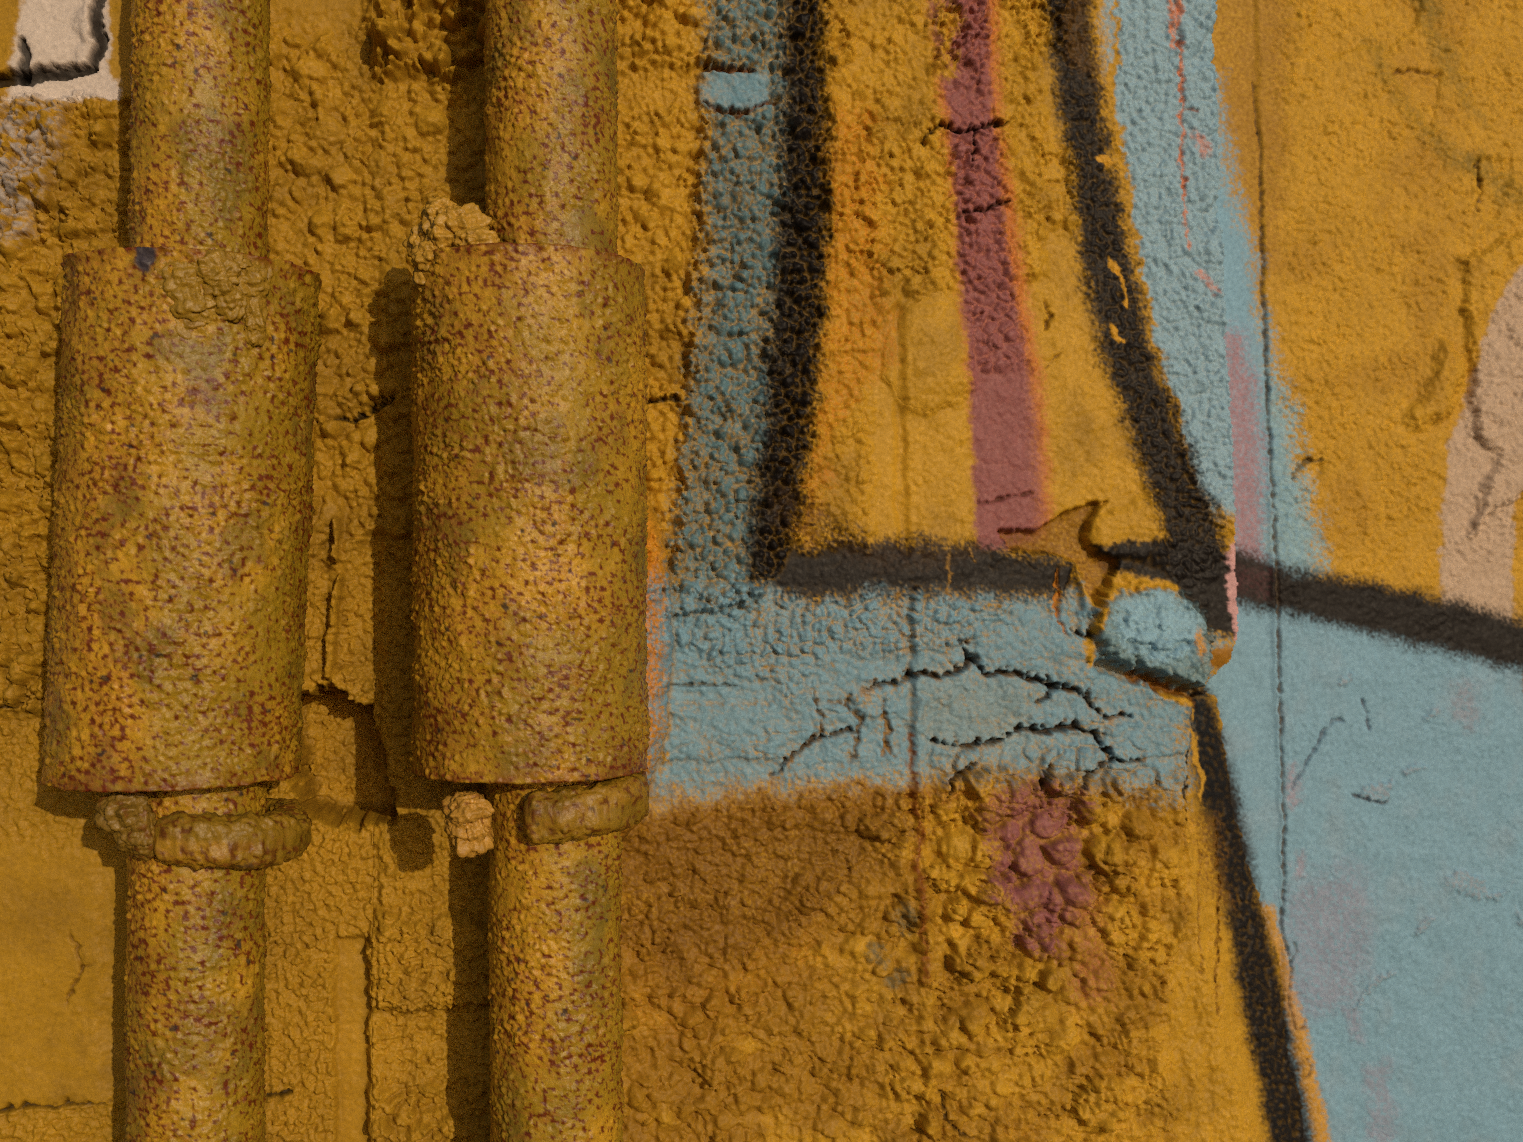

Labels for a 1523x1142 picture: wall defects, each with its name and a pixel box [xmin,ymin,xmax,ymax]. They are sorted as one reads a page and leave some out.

crack [922,121,1006,162]
crack [956,200,1011,220]
crack [769,639,1136,798]